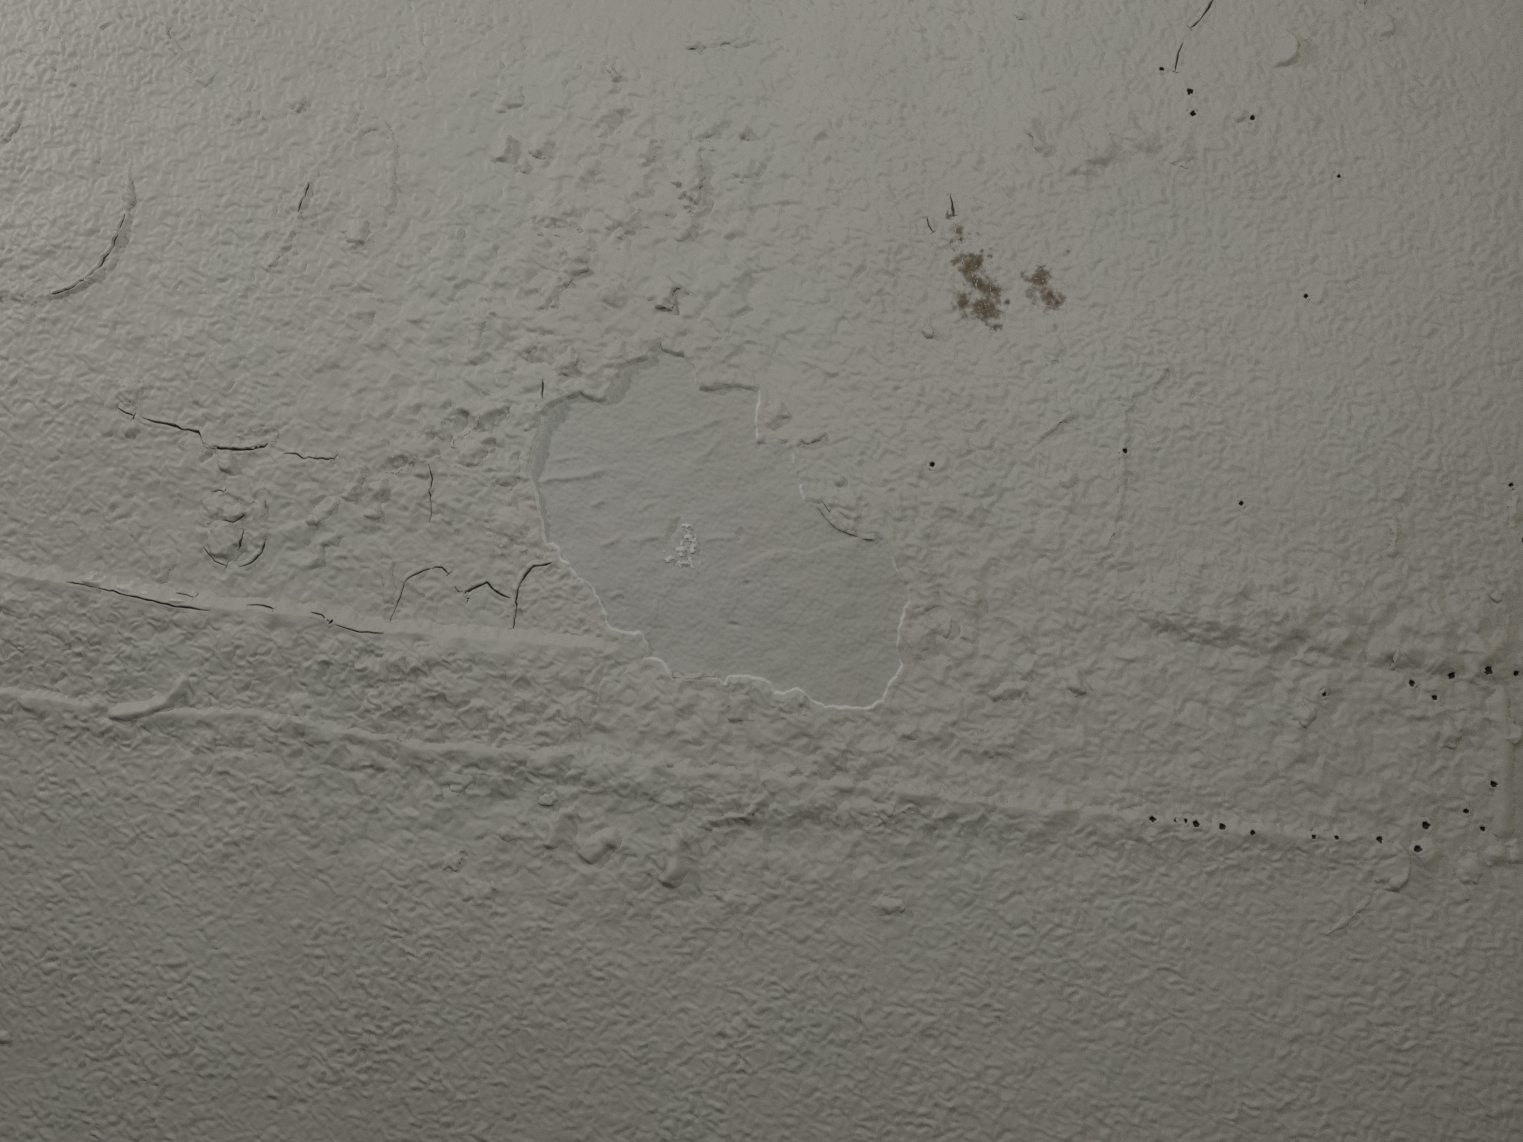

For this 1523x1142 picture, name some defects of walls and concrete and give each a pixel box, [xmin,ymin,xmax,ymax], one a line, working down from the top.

crack [64,403,560,639]